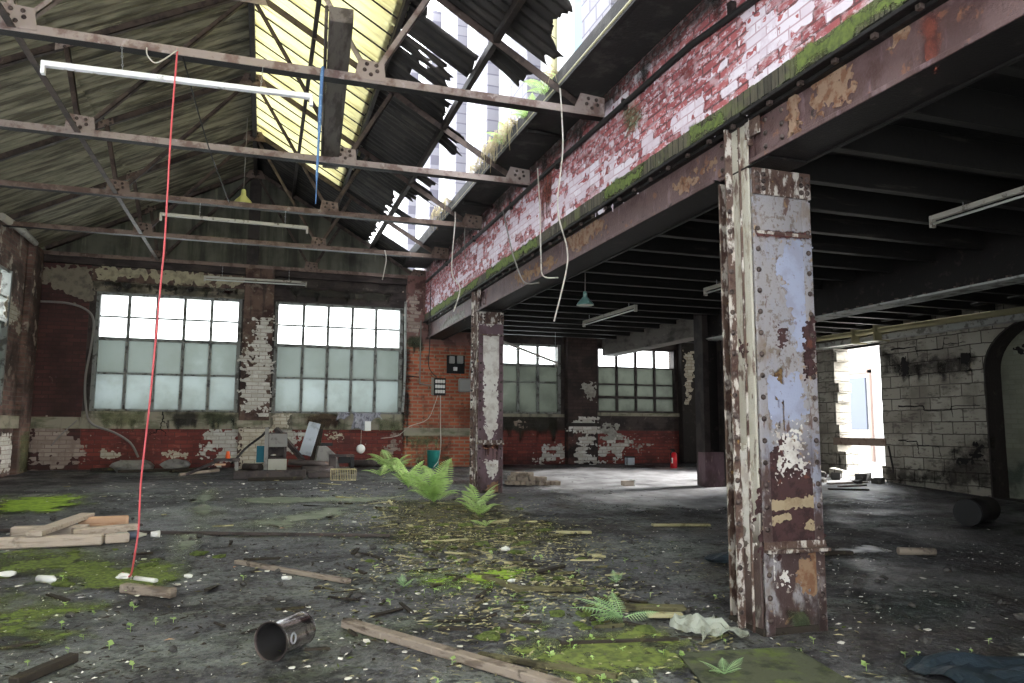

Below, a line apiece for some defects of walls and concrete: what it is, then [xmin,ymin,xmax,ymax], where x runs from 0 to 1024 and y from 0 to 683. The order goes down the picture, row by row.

rust [782,63,858,138]
rust [886,18,937,70]
peeling [402,0,853,353]
peeling [42,264,245,304]
peeling [161,315,305,469]
peeling [478,324,499,440]
peeling [532,416,654,465]
peeling [740,443,815,588]
peeling [767,371,811,485]
rust [752,396,828,597]
water stain [895,355,976,381]
water stain [886,438,993,487]